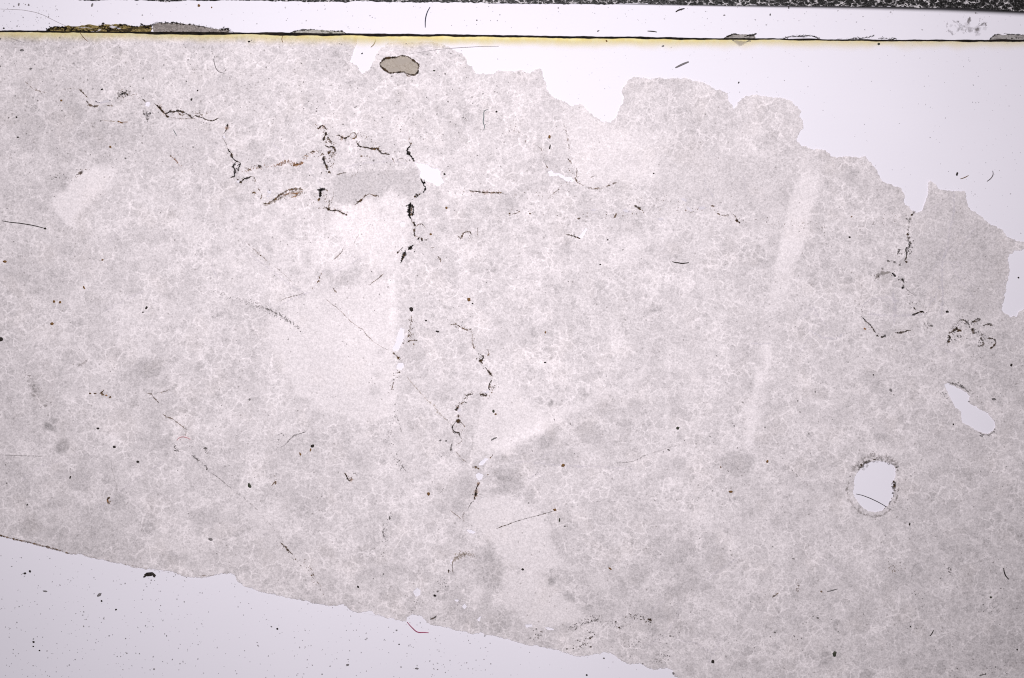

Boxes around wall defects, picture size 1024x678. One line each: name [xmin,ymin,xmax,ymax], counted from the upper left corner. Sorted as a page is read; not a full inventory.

crack [154,103,271,198]
crack [315,124,441,283]
crack [862,214,933,338]
crack [434,323,495,451]